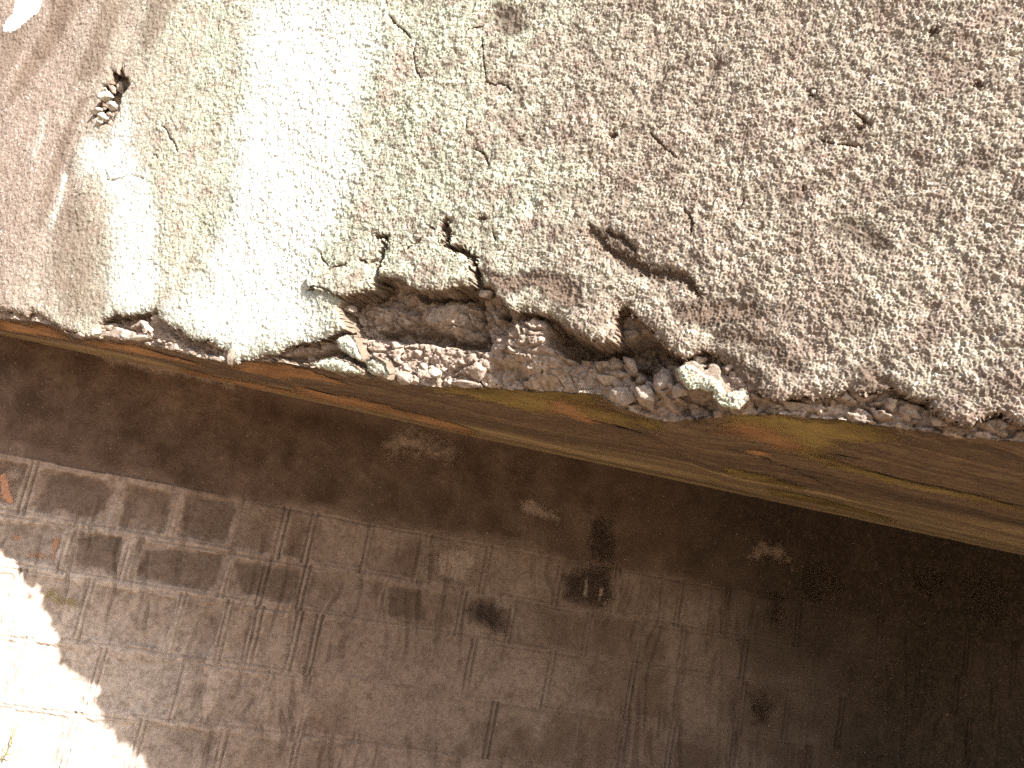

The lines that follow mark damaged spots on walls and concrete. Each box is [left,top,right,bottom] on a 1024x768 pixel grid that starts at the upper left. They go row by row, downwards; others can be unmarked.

spalling [90,76,130,126]
crack [308,224,484,300]
crack [593,231,698,293]
spalling [0,228,1024,442]
water stain [435,386,662,430]
water stain [726,414,1021,511]
water stain [471,604,502,628]
water stain [567,570,610,602]